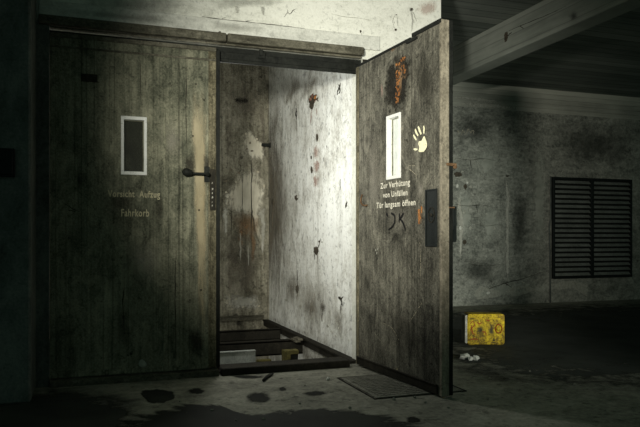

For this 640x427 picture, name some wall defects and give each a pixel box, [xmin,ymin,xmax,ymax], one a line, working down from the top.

rust [395,57,406,103]